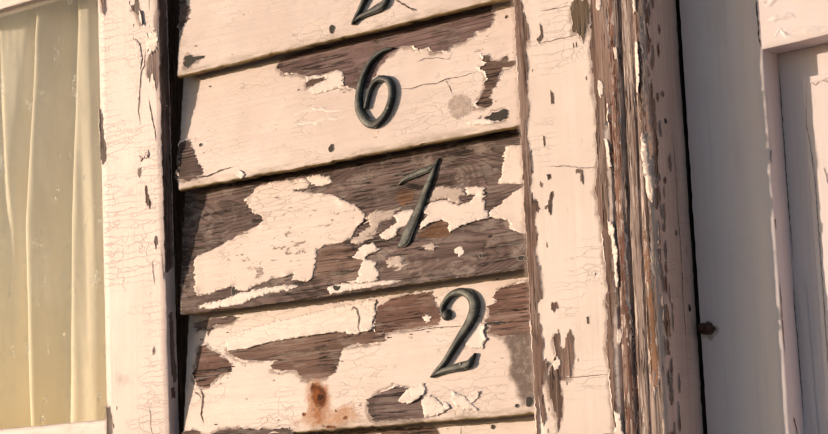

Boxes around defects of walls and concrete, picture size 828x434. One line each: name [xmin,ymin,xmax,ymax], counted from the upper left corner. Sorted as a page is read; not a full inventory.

peeling [98,106,107,165]
peeling [129,0,579,434]
peeling [570,0,639,434]
peeling [629,0,681,434]
crack [771,71,793,256]
crack [806,79,828,361]
peeling [106,406,117,434]
rust [302,384,350,428]
crack [780,286,804,434]